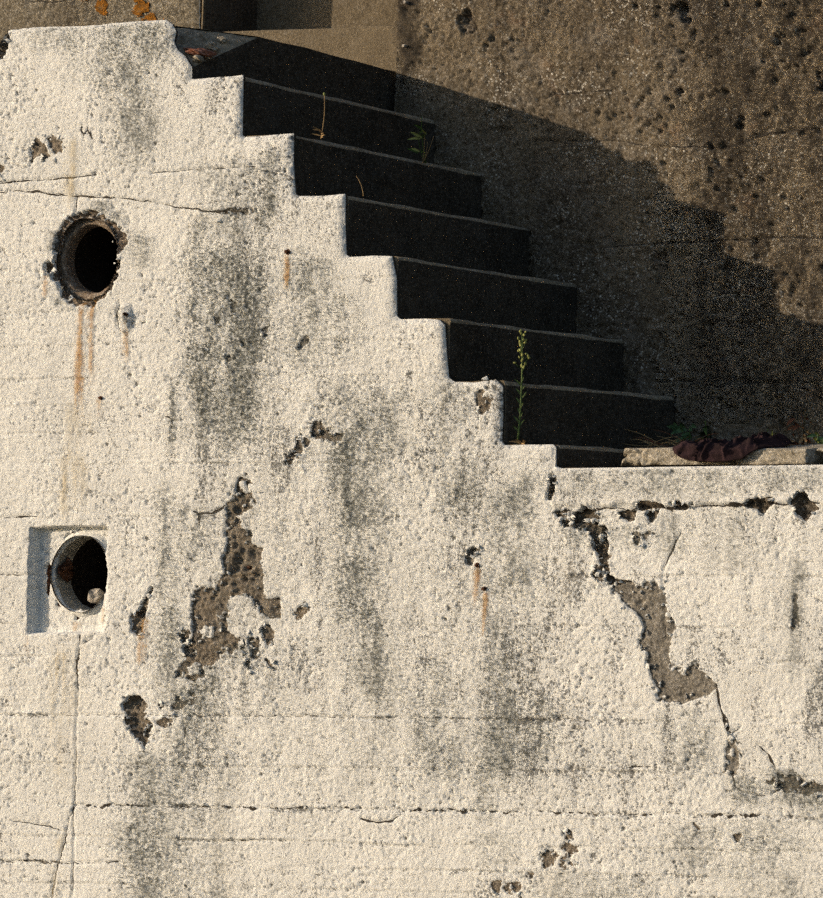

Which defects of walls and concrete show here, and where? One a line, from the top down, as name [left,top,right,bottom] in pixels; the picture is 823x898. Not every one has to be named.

crack [0,174,249,214]
rust [74,300,98,397]
leakage [167,151,364,464]
peeling [284,419,344,467]
peeling [122,473,311,746]
rust [474,569,487,630]
peeling [555,500,718,705]
leakage [105,477,290,898]
crack [715,683,738,733]
crack [0,633,679,894]
crack [711,746,819,819]
peeling [491,828,579,898]